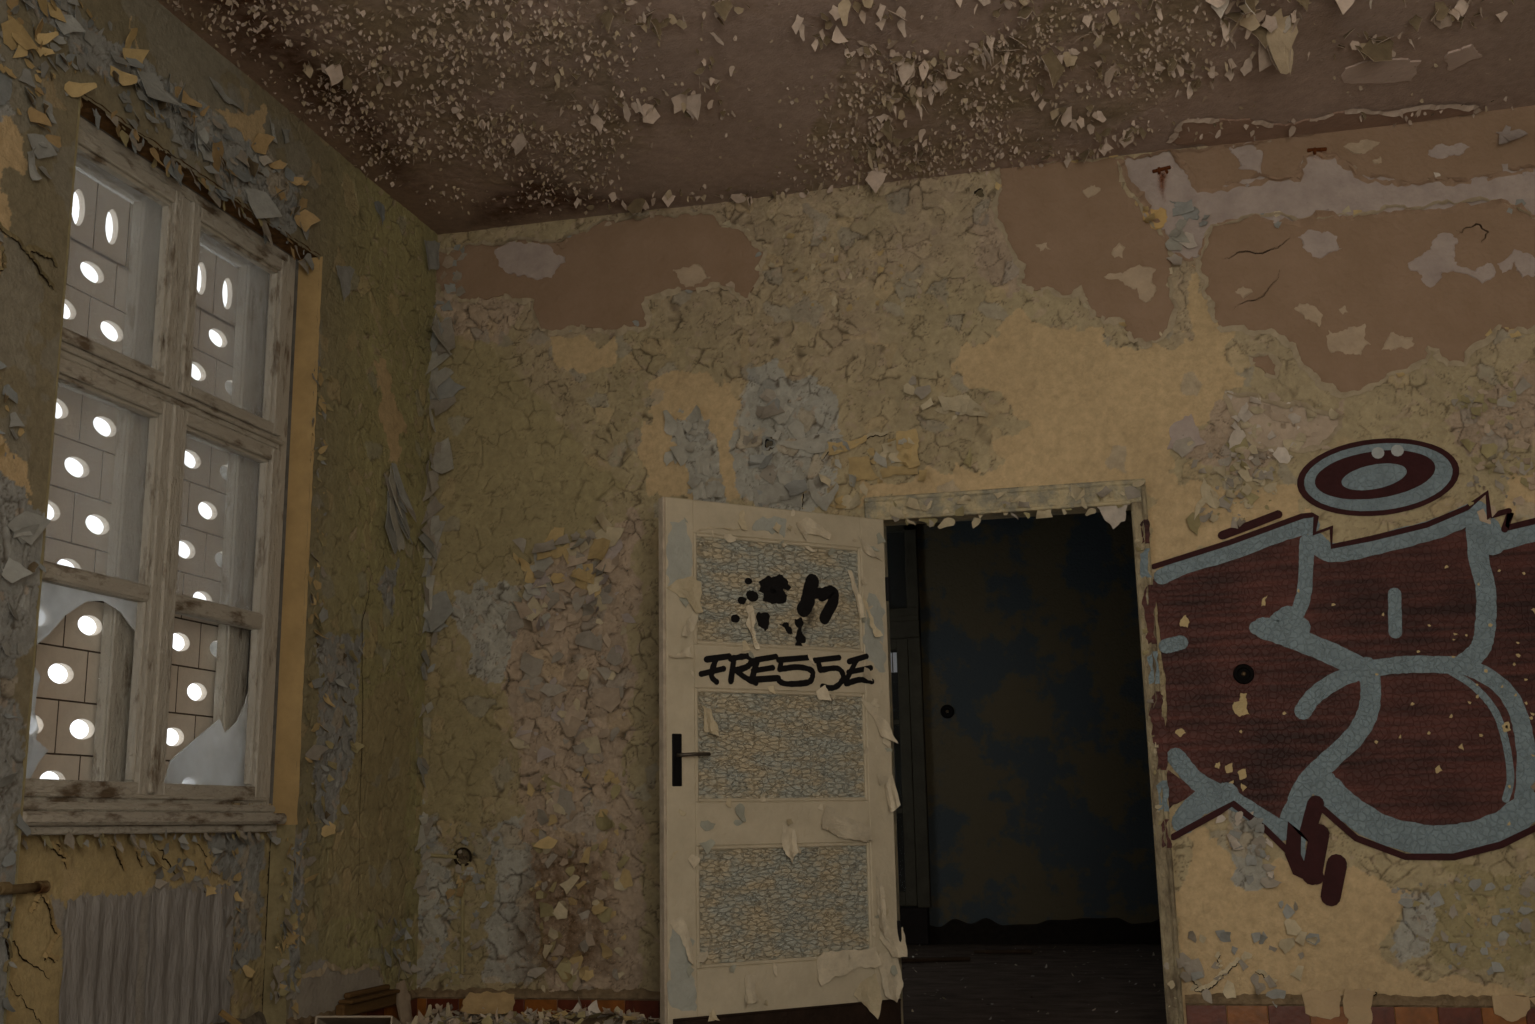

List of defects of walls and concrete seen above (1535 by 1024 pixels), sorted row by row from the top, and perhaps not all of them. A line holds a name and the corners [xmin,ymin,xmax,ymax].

peeling [278,51,536,156]
peeling [480,0,750,132]
crack [0,222,58,290]
flaking render [538,0,1535,535]
peeling [384,240,467,681]
spalling [1215,762,1247,791]
peeling [1163,811,1375,1024]
peeling [1391,871,1535,976]